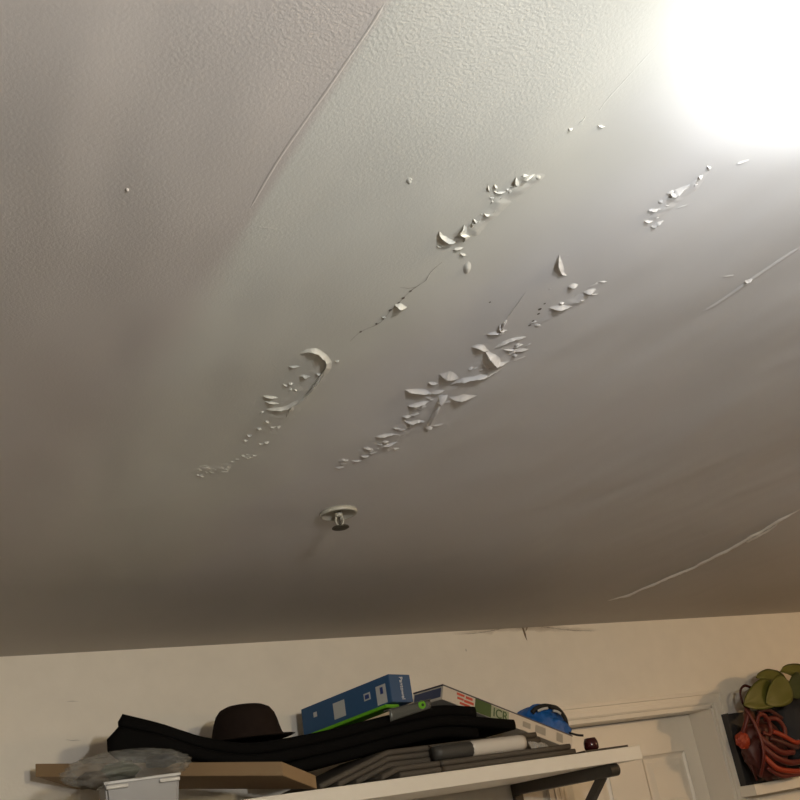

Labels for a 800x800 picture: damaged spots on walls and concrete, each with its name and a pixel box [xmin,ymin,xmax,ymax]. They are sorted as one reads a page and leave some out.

peeling [437,174,545,274]
peeling [645,166,712,229]
crack [359,263,441,333]
peeling [244,348,339,445]
peeling [335,292,531,469]
crack [608,510,799,601]